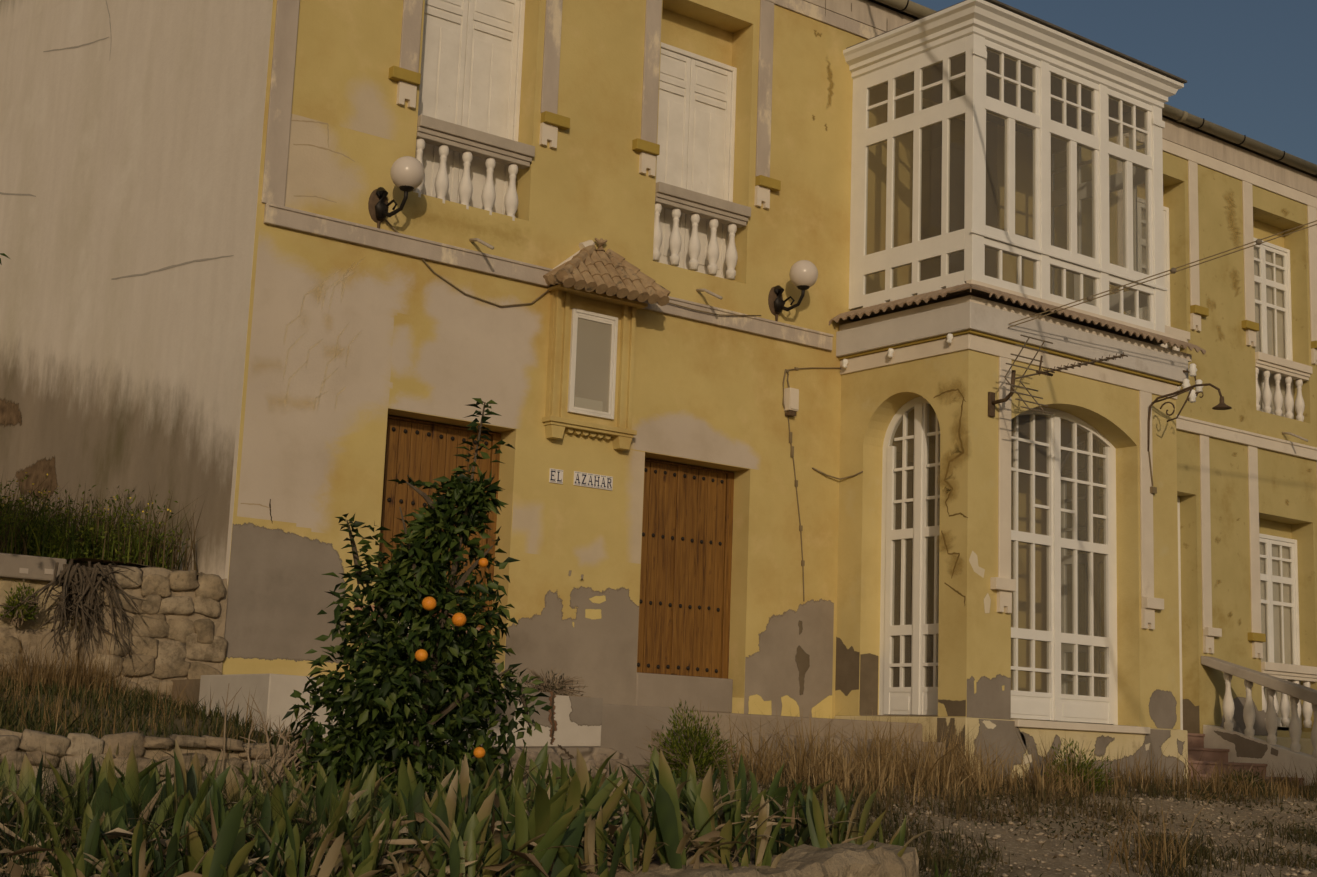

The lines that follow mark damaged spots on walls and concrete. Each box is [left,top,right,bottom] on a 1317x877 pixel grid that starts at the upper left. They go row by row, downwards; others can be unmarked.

crack [111,255,234,280]
flaking render [0,399,22,427]
flaking render [16,457,57,501]
water stain [0,311,239,579]
peeling [480,404,765,728]
peeling [744,592,834,719]
peeling [967,668,1185,784]